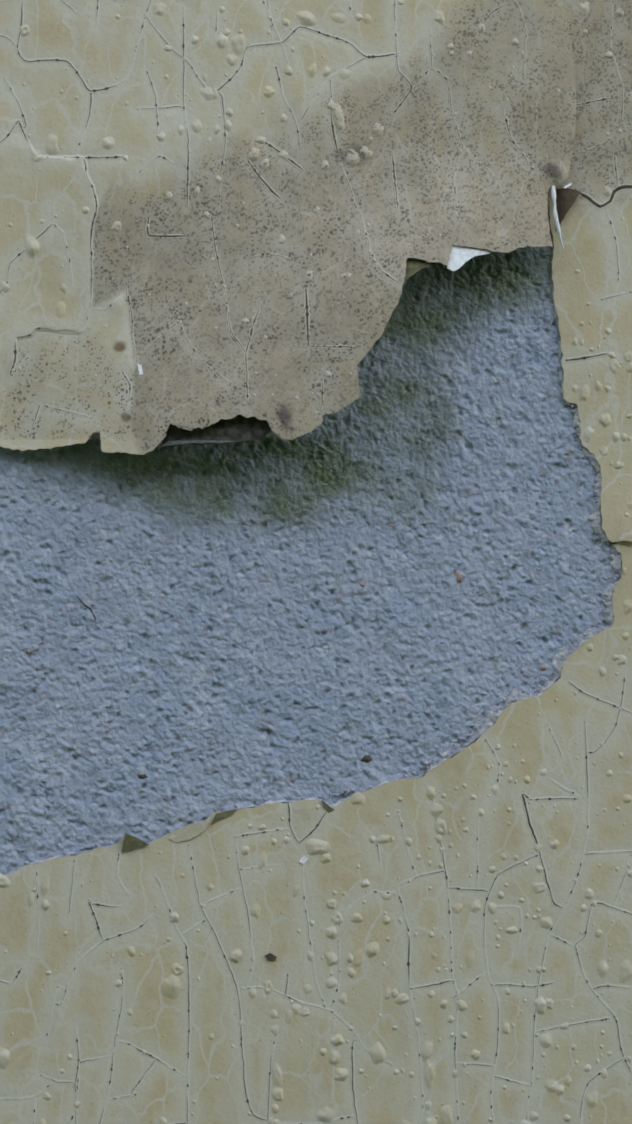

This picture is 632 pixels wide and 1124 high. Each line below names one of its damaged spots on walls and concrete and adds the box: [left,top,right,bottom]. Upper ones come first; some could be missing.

crack [0,0,505,415]
spalling [0,0,621,875]
crack [565,352,608,363]
crack [578,183,632,302]
crack [0,667,632,1124]